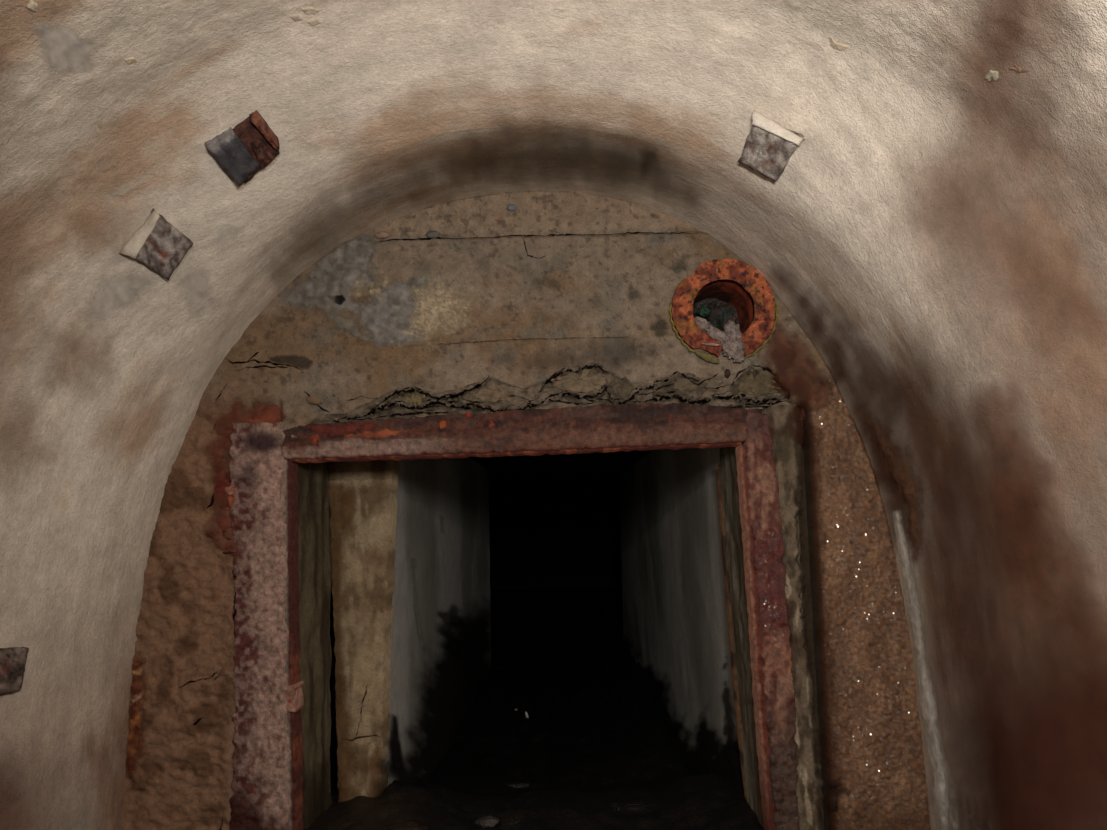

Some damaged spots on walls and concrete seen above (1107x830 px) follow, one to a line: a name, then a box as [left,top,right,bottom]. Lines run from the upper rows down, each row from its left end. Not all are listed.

crack [373,232,704,258]
corrosion [205,403,284,552]
corrosion [307,422,400,445]
crack [211,352,792,433]
crack [412,337,618,346]
damp [800,298,949,830]
damp [895,381,1107,830]
corrosion [336,690,352,802]